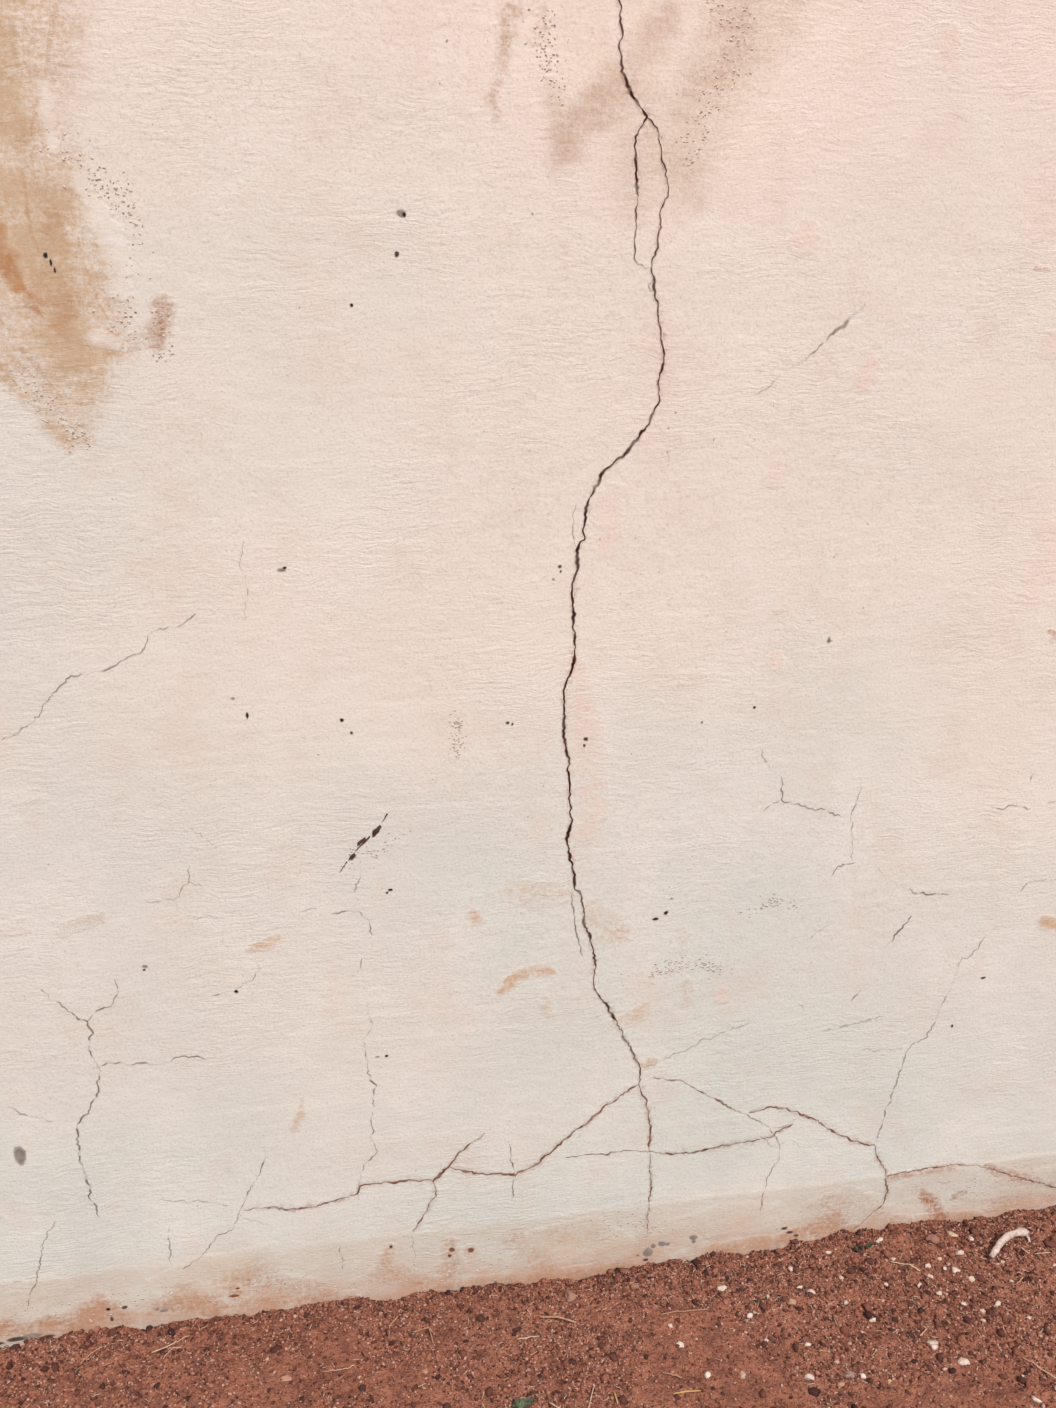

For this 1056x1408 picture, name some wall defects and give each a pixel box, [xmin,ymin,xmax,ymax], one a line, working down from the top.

damp [0,0,180,455]
damp [484,0,553,123]
damp [536,0,820,231]
crack [185,0,1056,1268]